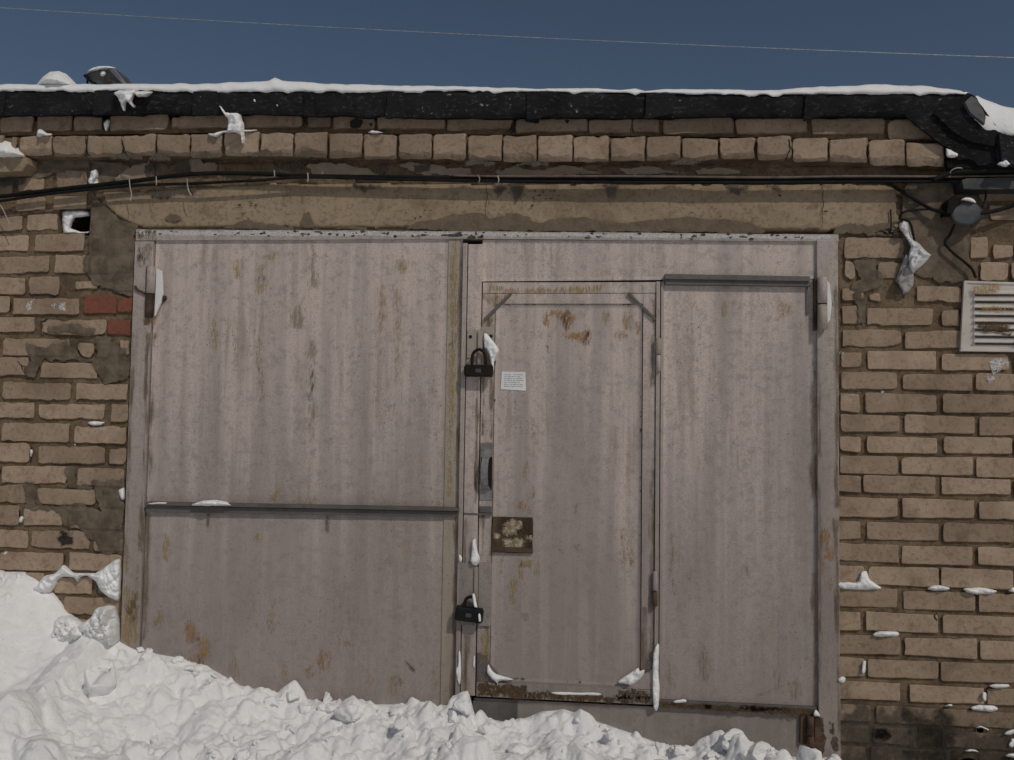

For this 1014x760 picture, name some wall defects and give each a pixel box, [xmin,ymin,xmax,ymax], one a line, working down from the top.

flaking render [183,151,217,173]
flaking render [297,150,378,175]
flaking render [400,159,600,176]
flaking render [620,157,740,175]
spalling [134,190,899,271]
rust [484,284,602,343]
rust [120,511,150,645]
rust [451,652,841,754]
water stain [840,703,1014,760]